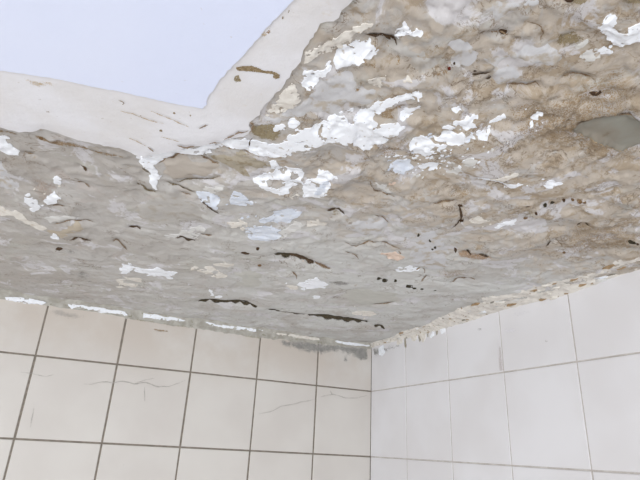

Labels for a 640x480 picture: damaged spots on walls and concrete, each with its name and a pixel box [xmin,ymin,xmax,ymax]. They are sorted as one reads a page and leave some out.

peeling [575,14,640,62]
peeling [0,0,423,199]
peeling [385,113,506,179]
flaking render [573,113,640,152]
peeling [0,176,76,240]
peeling [196,185,256,214]
peeling [227,209,327,241]
peeling [542,179,563,189]
peeling [117,263,177,288]
flaking render [68,304,127,316]
flaking render [143,313,185,321]
flaking render [335,257,640,356]